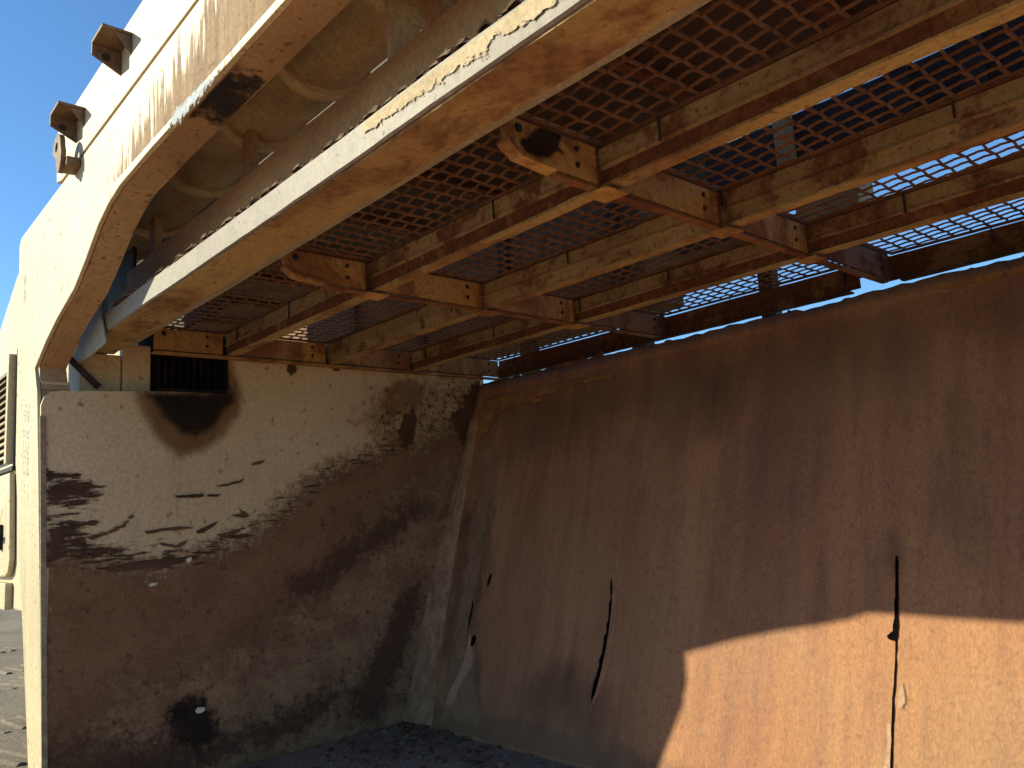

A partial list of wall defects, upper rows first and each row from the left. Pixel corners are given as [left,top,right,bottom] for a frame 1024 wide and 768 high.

peeling [362,0,556,133]
damp [106,540,188,572]
crack [588,578,617,711]
crack [883,556,905,768]